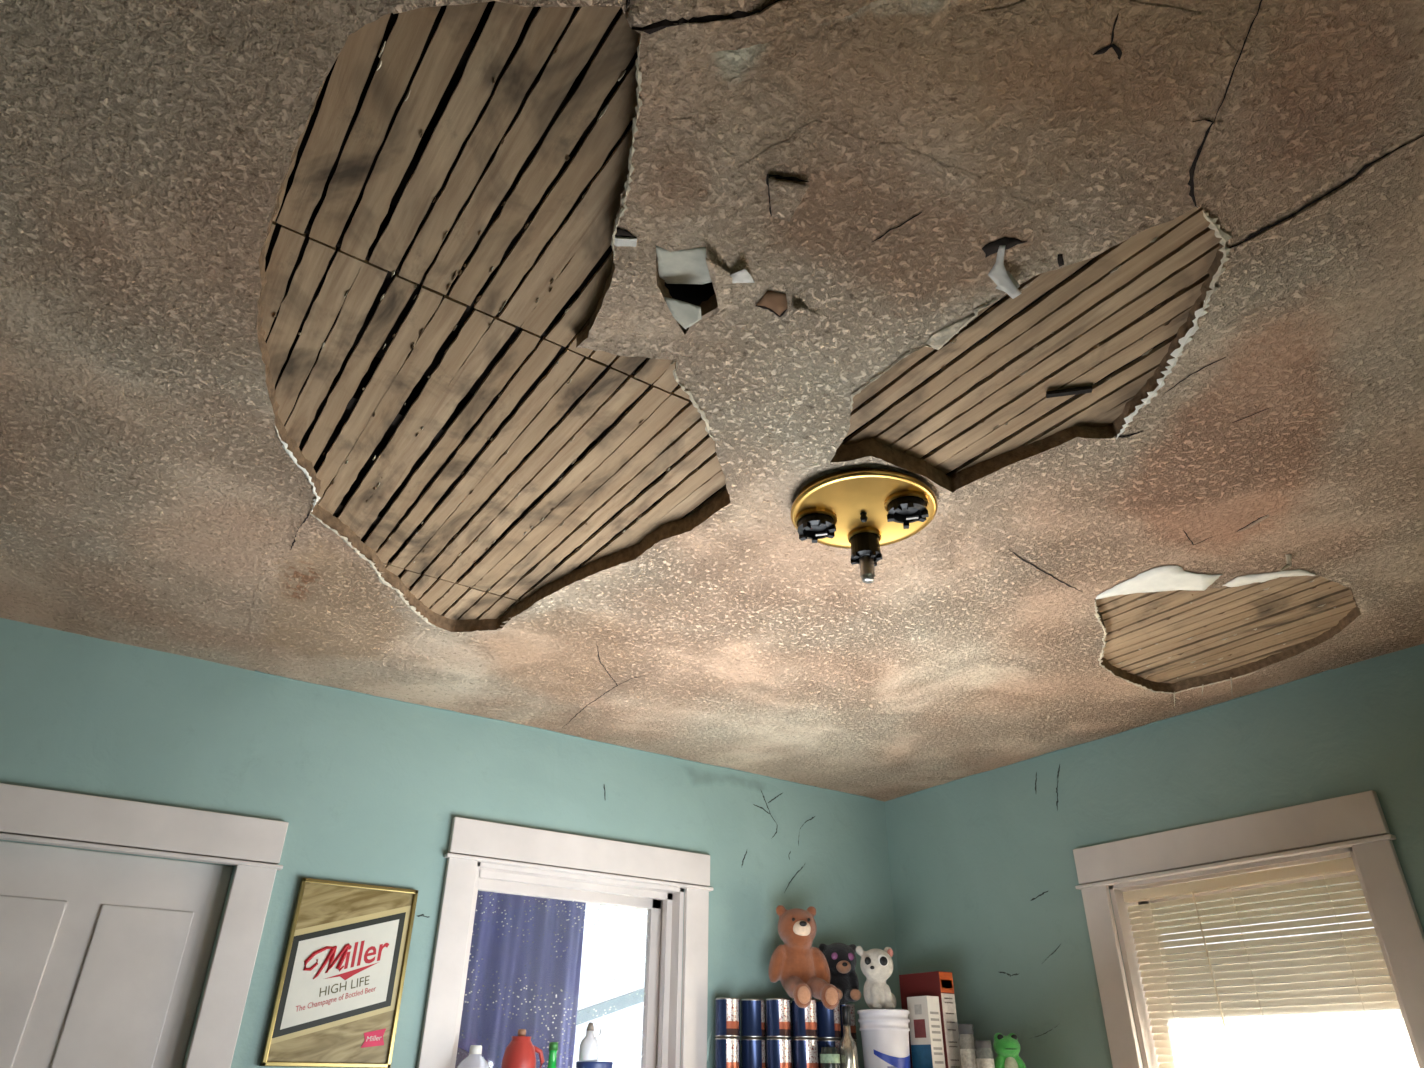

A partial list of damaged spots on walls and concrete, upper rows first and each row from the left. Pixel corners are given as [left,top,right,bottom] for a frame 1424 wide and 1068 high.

crack [1188,0,1262,208]
crack [1227,135,1424,263]
flaking render [261,0,877,630]
flaking render [840,207,1231,477]
flaking render [1094,554,1356,708]
crack [742,790,815,896]